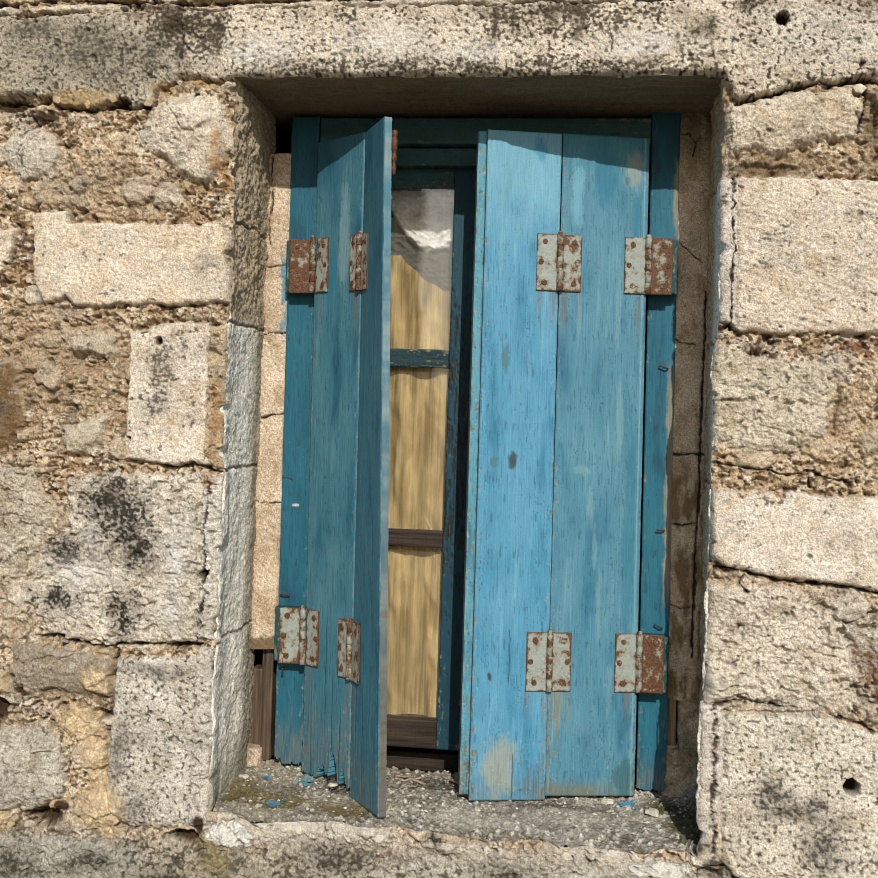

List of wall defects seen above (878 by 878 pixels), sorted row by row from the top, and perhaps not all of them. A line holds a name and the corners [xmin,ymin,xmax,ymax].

crack [671,178,878,658]
leakage [31,475,193,628]
leakage [106,591,141,644]
crack [43,461,223,672]